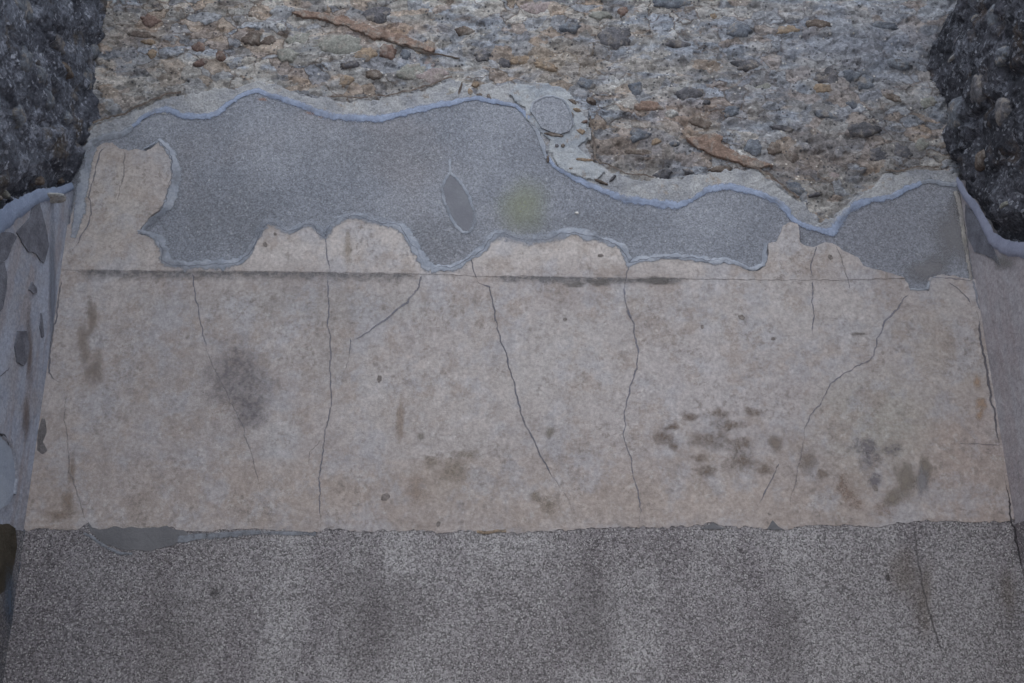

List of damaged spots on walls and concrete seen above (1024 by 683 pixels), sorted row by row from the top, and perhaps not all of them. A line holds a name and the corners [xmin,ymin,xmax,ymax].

spalling [0,0,1024,311]
crack [318,238,421,513]
crack [471,259,551,474]
crack [623,266,640,507]
mould [696,410,769,473]
crack [808,296,907,421]
damp [886,459,930,503]